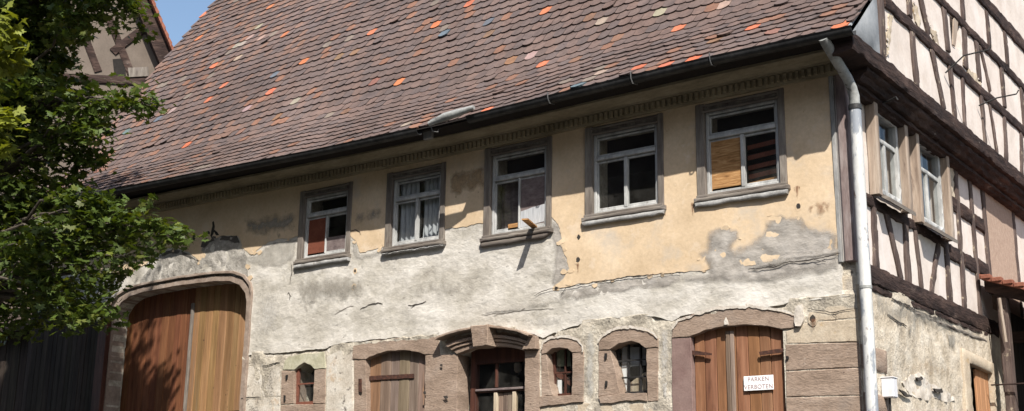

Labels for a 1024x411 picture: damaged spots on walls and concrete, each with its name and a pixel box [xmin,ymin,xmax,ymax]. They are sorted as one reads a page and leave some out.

flaking render [136,235,295,288]
flaking render [553,214,837,299]
crack [483,272,679,316]
spalling [794,304,805,327]
flaking render [898,372,955,402]